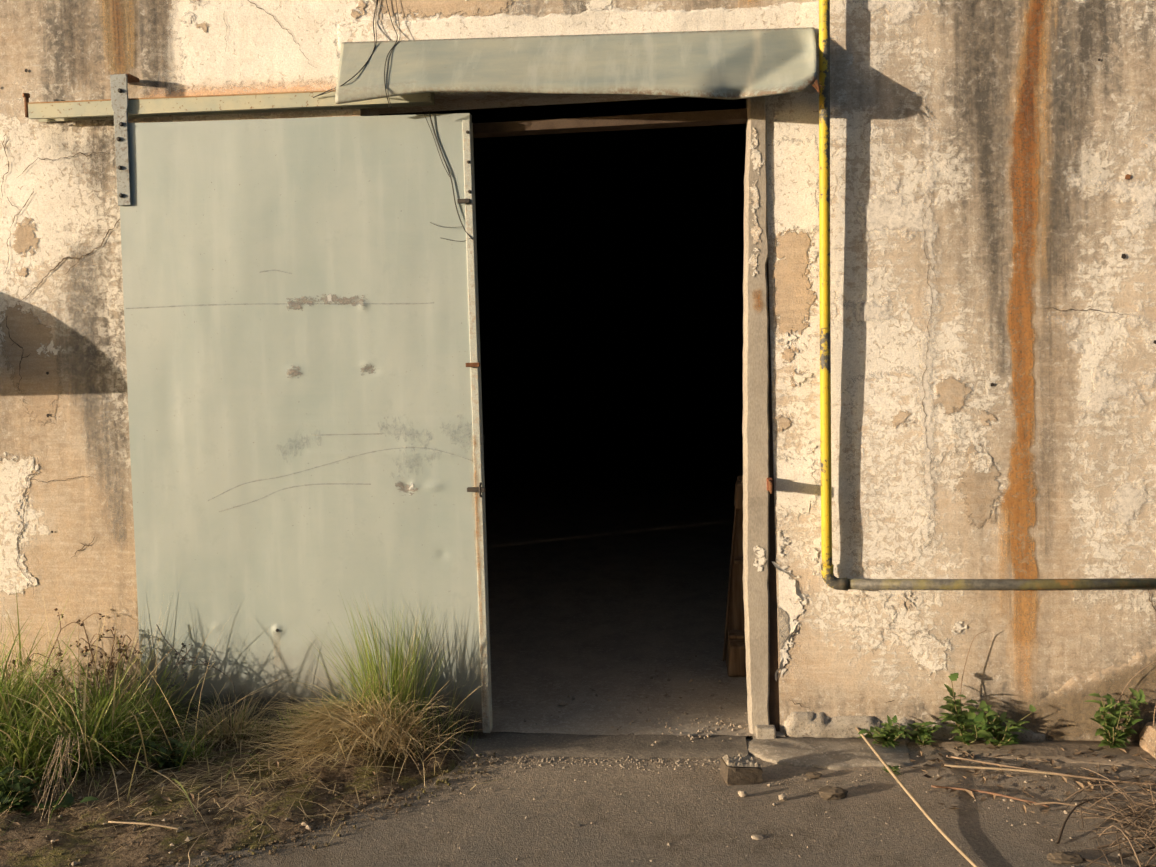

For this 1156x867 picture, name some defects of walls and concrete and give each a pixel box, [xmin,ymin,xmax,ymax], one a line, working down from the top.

crack [224,0,314,67]
peeling [584,0,615,11]
peeling [8,217,41,277]
crack [1,131,115,273]
crack [6,219,120,391]
peeling [748,127,819,387]
peeling [843,112,1003,576]
rust [1000,0,1050,681]
peeling [0,452,42,596]
peeling [753,438,822,682]
peeling [847,589,967,678]